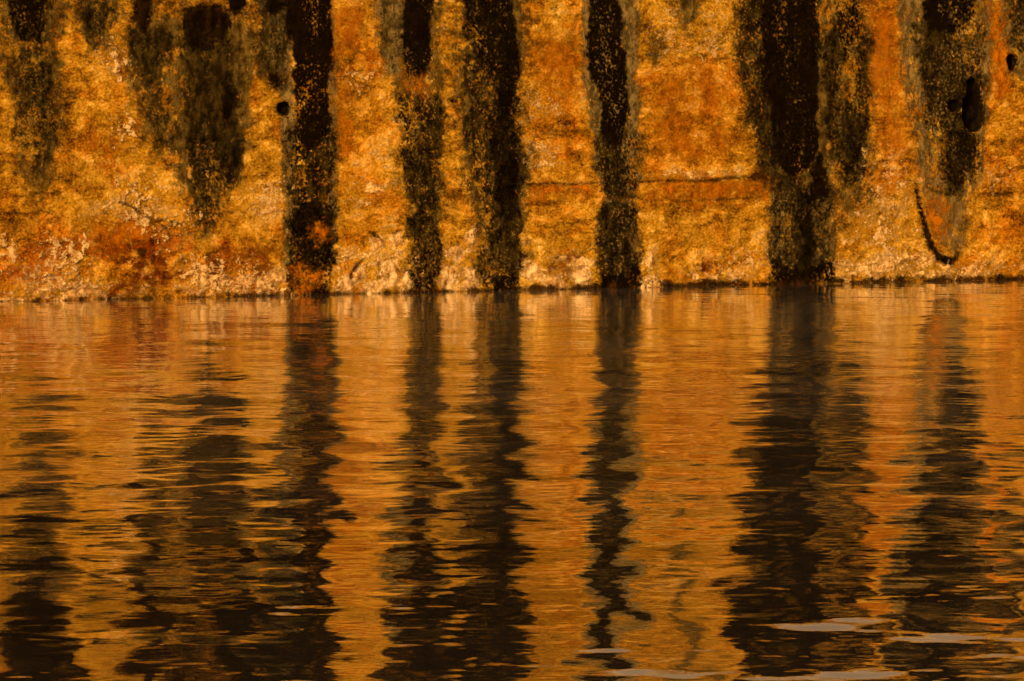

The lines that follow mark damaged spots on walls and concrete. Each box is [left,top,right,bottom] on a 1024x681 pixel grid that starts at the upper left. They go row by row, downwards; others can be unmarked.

rust [69,213,170,299]
water stain [0,0,1024,302]